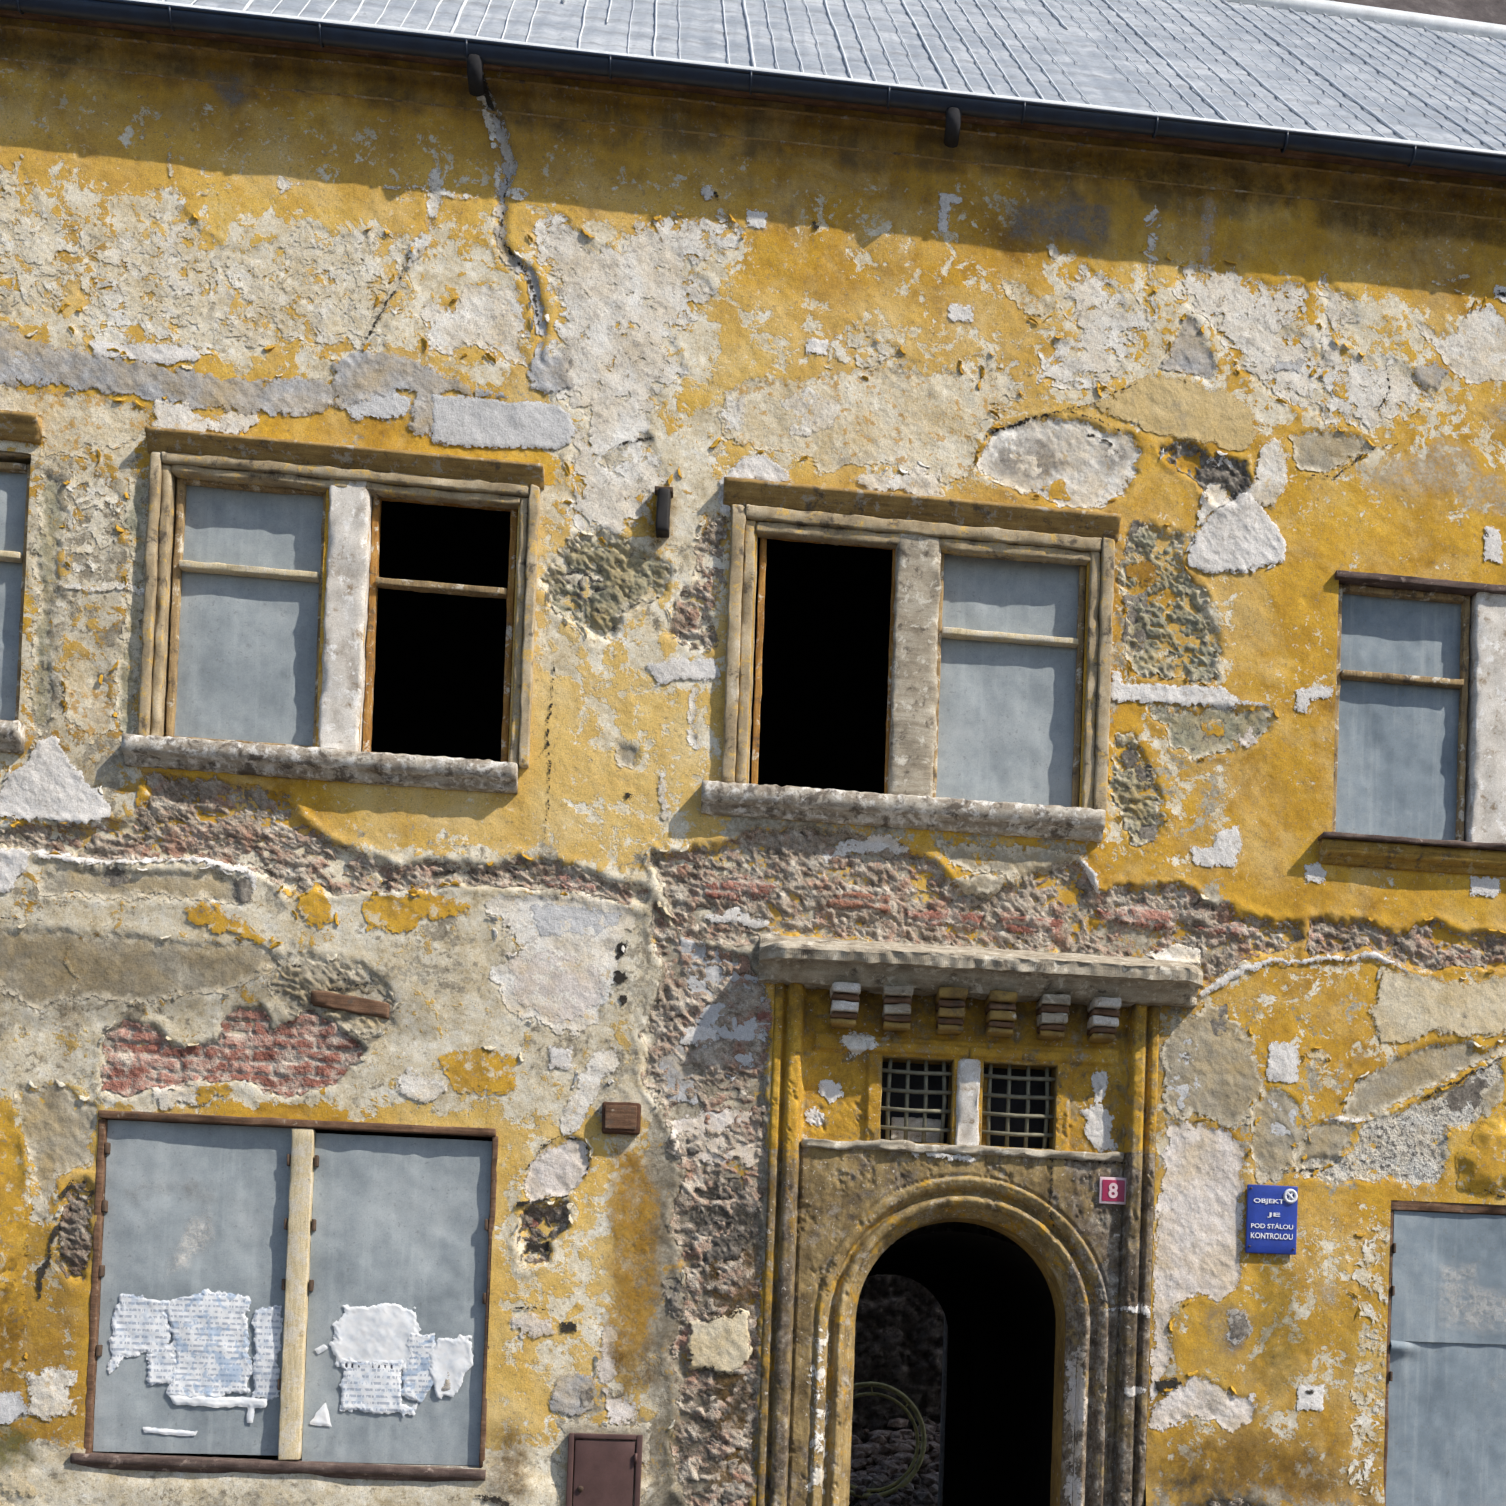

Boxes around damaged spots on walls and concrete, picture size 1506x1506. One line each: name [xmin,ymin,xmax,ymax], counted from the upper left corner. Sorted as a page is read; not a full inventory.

peeling [0,94,531,370]
crack [476,73,550,356]
peeling [527,205,1506,762]
spalling [0,769,1506,1506]